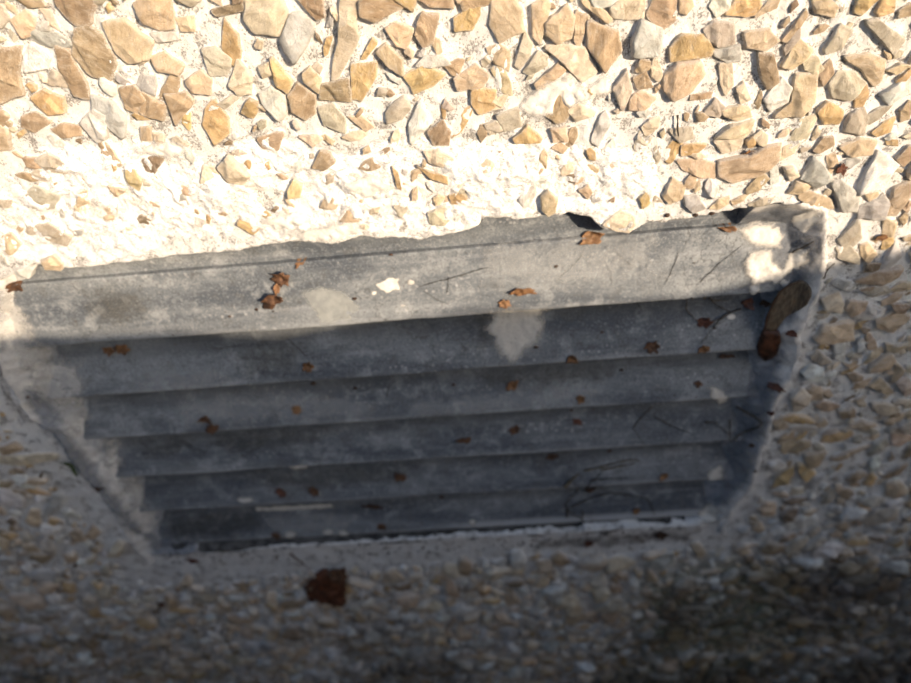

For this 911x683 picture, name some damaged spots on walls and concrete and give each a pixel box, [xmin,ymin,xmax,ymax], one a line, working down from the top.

damp [738,206,825,288]